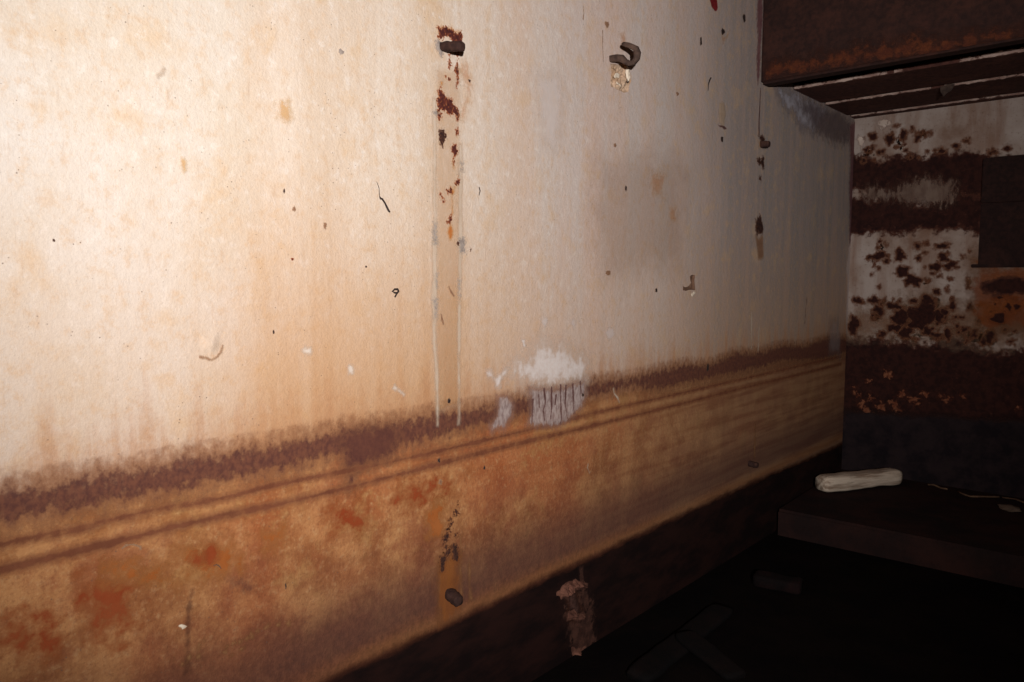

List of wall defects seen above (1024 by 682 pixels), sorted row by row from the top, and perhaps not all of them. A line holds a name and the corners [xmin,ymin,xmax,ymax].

corrosion [764,26,1023,80]
corrosion [844,124,1024,420]
leakage [0,335,847,575]
corrosion [326,502,369,537]
corrosion [0,605,62,657]
corrosion [177,542,242,584]
corrosion [440,556,459,620]
spalling [556,579,596,649]